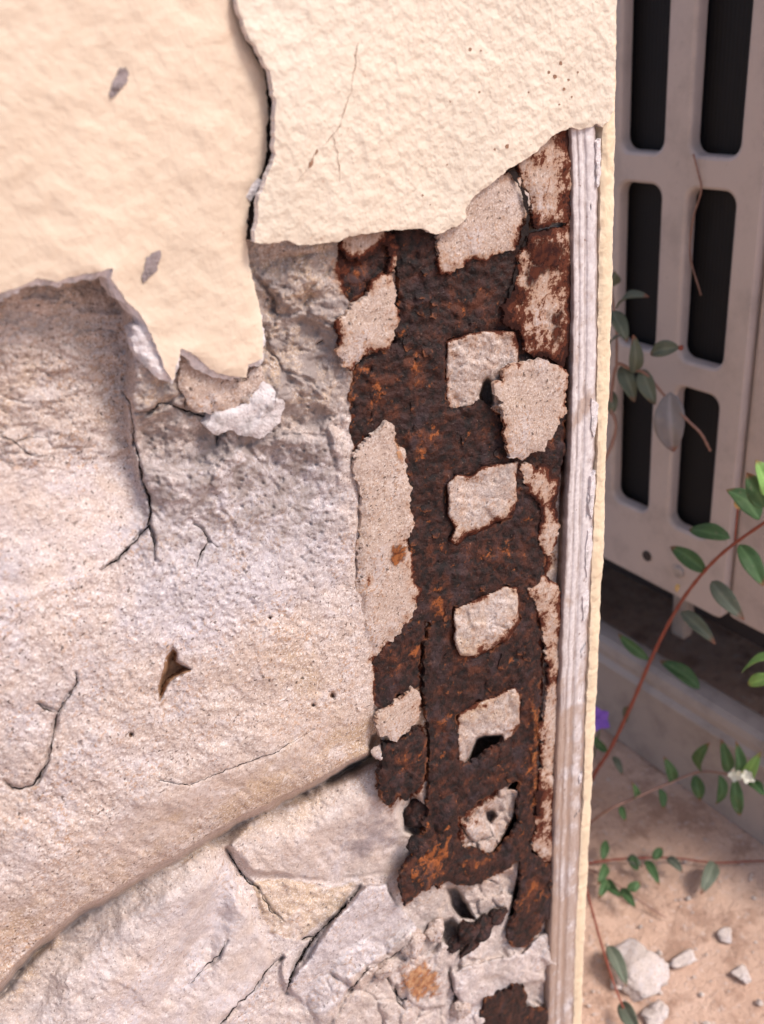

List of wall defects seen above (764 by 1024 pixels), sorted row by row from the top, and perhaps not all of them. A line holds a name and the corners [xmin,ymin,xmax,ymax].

crack [246,42,272,240]
peeling [0,0,617,624]
crack [103,394,224,569]
rust [342,229,567,948]
spalling [451,584,520,658]
crack [5,675,78,790]
crack [158,731,311,785]
crack [227,851,282,923]
spalling [0,621,557,1024]
crack [220,891,358,1024]
rust [402,962,440,1002]
rust [479,982,549,1024]